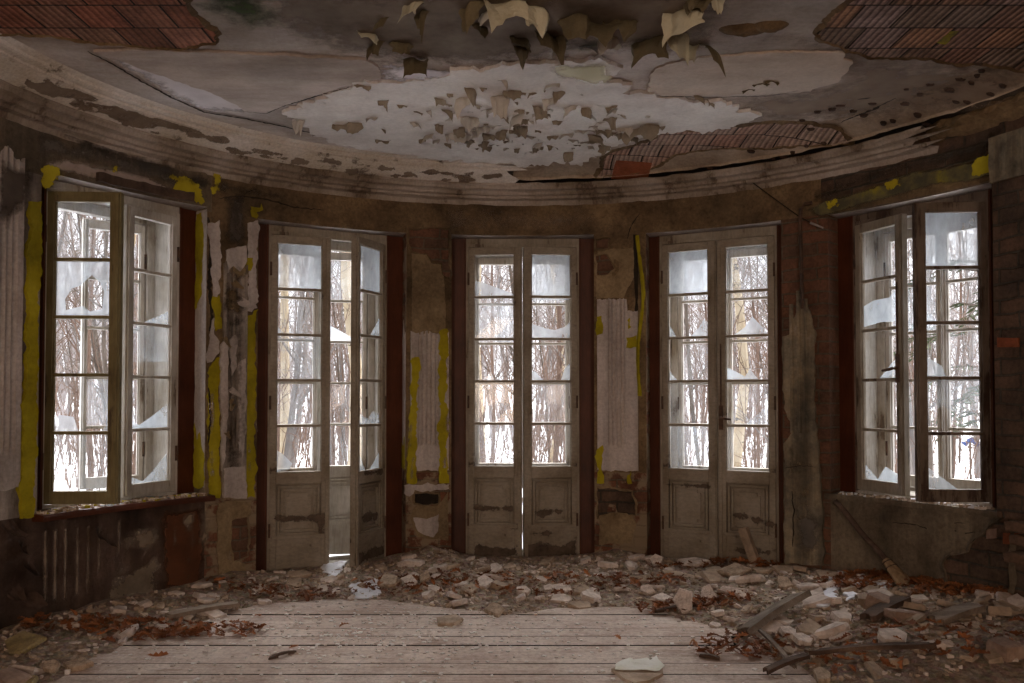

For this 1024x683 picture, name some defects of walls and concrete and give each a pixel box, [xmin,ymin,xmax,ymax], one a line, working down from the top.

leakage [122,62,242,111]
peeling [0,0,1024,183]
leakage [0,166,31,221]
peeling [40,164,64,189]
leakage [38,135,177,183]
peeling [885,178,900,191]
leakage [811,134,995,216]
peeling [169,173,263,499]
peeling [626,235,646,396]
peeling [402,320,450,537]
spalling [594,445,638,519]